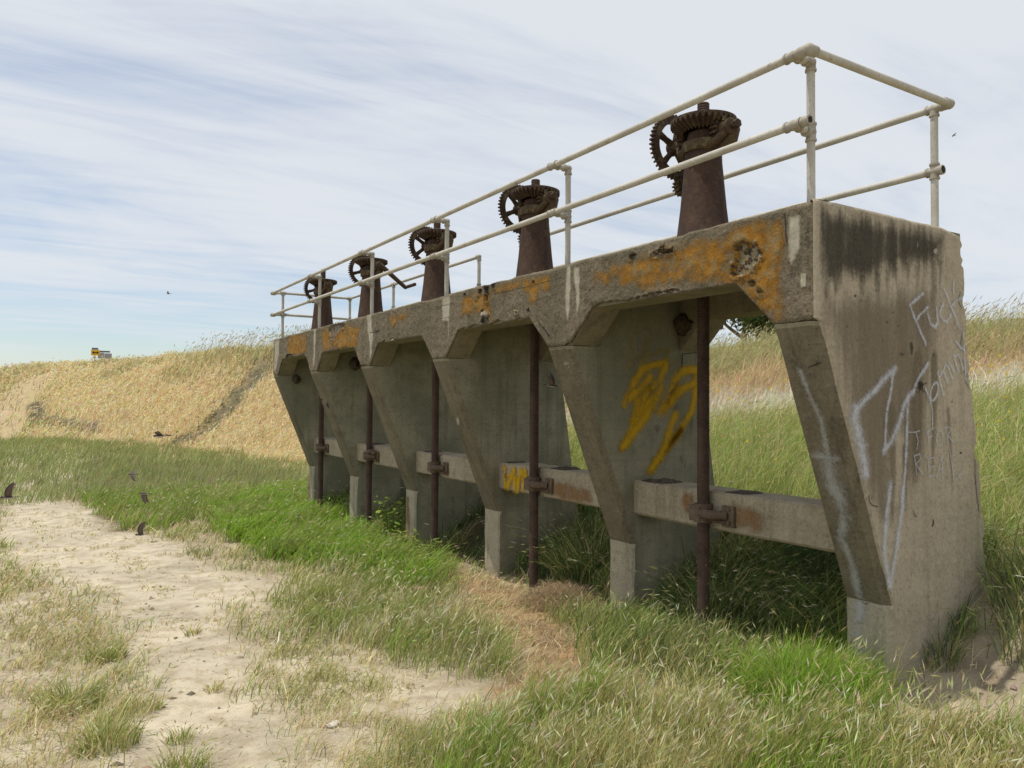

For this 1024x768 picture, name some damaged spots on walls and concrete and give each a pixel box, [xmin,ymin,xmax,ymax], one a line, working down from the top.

spalling [729,239,763,293]
water stain [821,208,944,281]